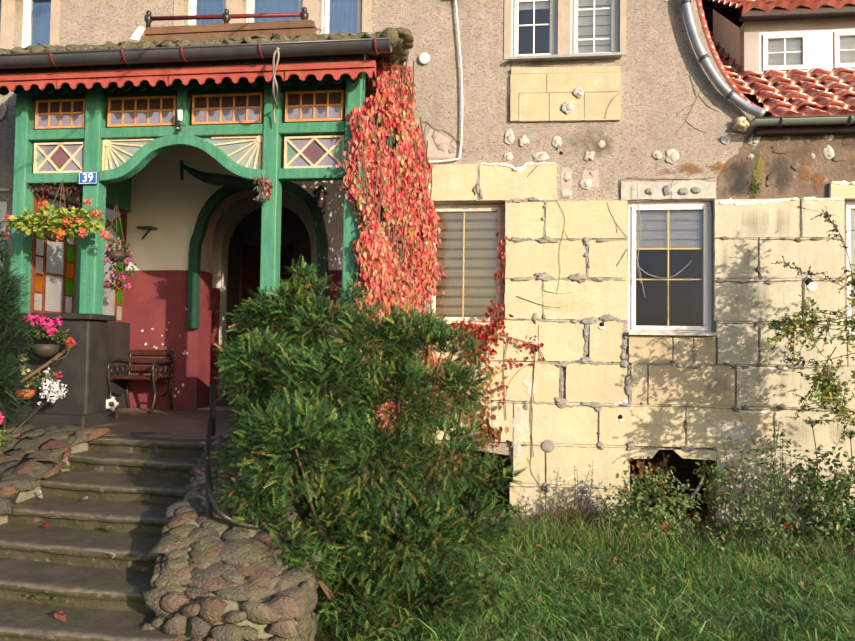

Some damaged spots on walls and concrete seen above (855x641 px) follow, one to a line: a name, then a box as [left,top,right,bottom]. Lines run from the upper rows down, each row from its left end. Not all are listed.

spalling [472,162,555,201]
spalling [496,197,840,442]
crack [674,75,719,135]
peeling [715,133,855,325]